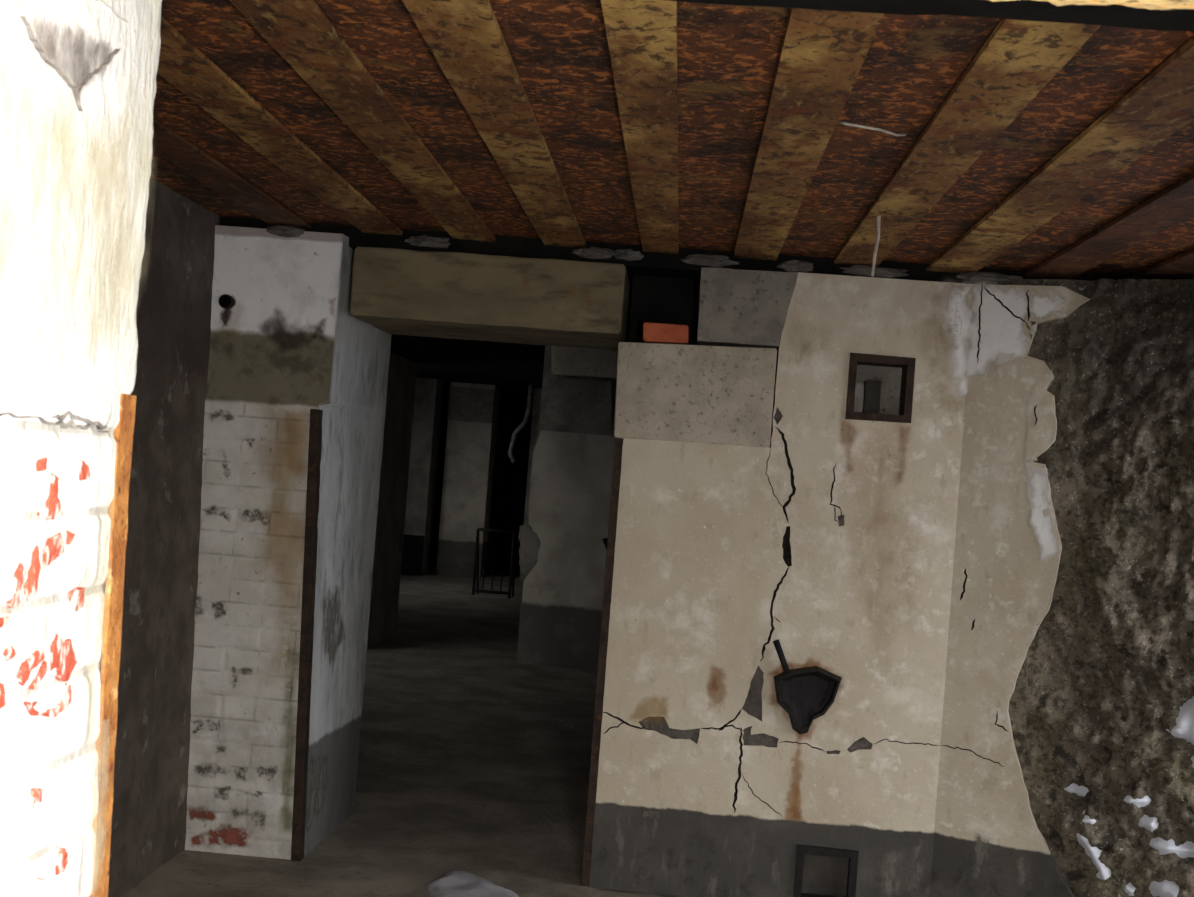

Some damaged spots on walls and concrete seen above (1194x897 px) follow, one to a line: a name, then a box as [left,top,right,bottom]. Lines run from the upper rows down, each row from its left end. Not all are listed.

damp [263,319,323,349]
crack [0,410,110,433]
spalling [79,459,91,480]
crack [766,427,796,523]
spalling [0,457,75,628]
spalling [68,587,85,612]
crack [760,567,789,662]
spalling [3,634,77,718]
crack [603,712,645,734]
crack [701,709,783,818]
spalling [30,788,43,804]
spalling [33,848,71,894]